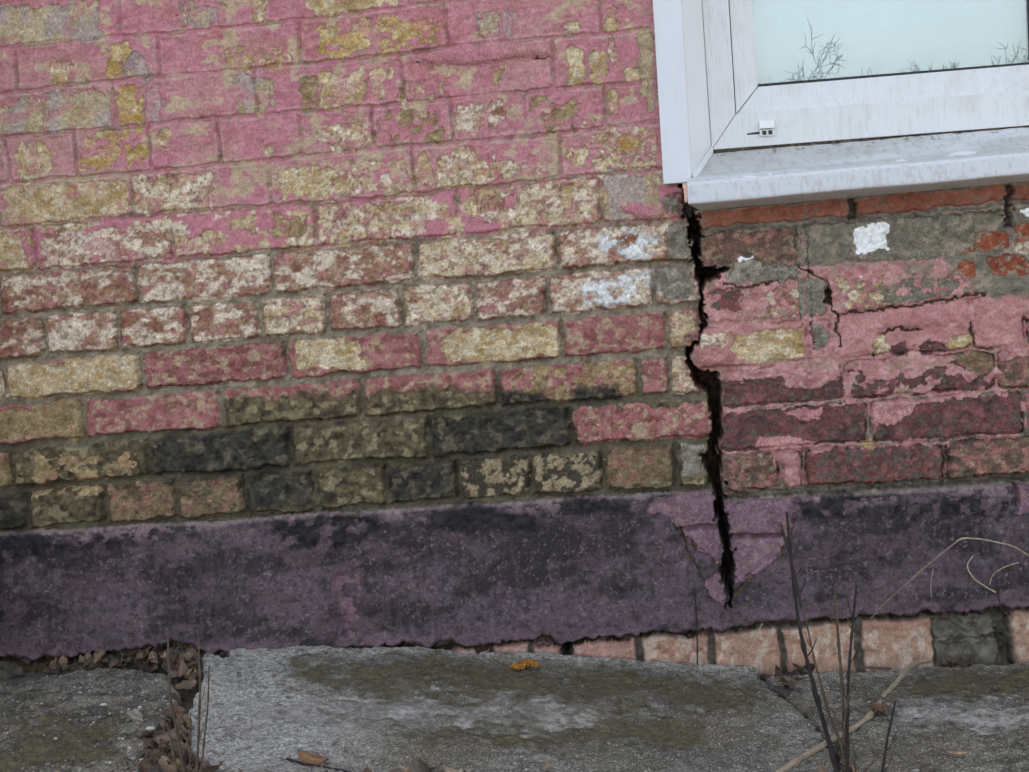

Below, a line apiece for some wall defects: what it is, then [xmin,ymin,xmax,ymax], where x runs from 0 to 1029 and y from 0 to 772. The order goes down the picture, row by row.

water stain [331,570,362,639]
peeling [0,0,1029,606]
crack [383,188,1028,654]